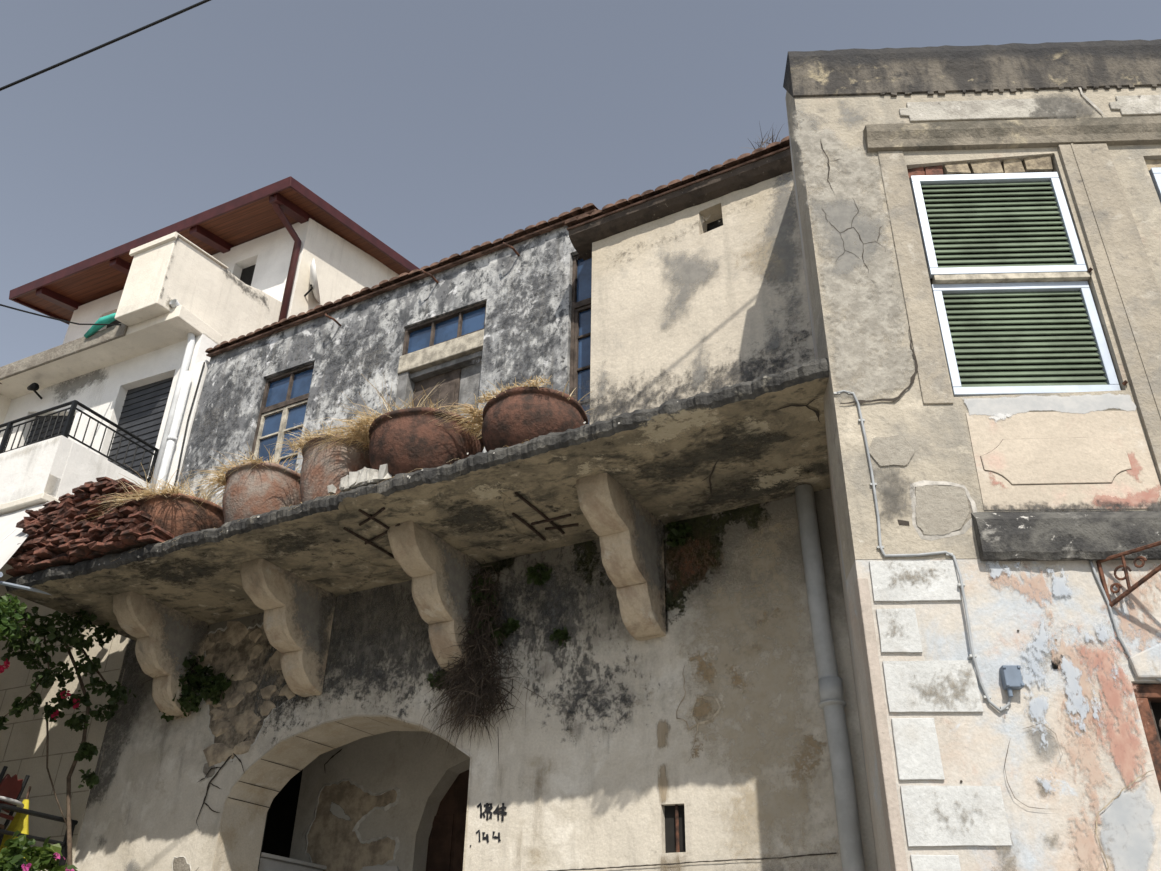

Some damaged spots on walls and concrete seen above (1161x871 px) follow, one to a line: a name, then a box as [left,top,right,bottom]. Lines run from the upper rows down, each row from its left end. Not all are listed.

crack [821,143,886,274]
leakage [187,314,405,478]
leakage [476,249,573,389]
leakage [581,330,810,424]
spalling [326,493,419,569]
spalling [471,482,591,544]
leakage [620,423,810,515]
flaking render [200,621,296,779]
leakage [234,584,457,740]
leakage [468,545,642,730]
peeling [986,561,1161,871]
flaking render [304,778,401,871]